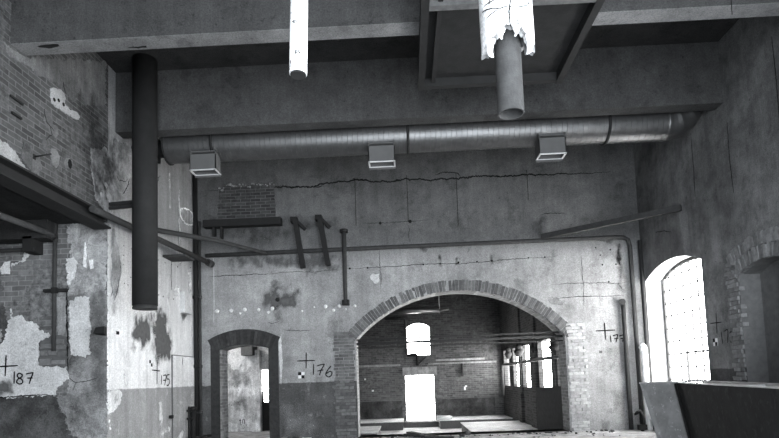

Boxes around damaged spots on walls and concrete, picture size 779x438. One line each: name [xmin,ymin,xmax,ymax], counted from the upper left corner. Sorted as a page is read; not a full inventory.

crack [274,171,610,189]
leakage [263,282,299,319]
spalling [0,303,8,344]
leakage [132,308,172,363]